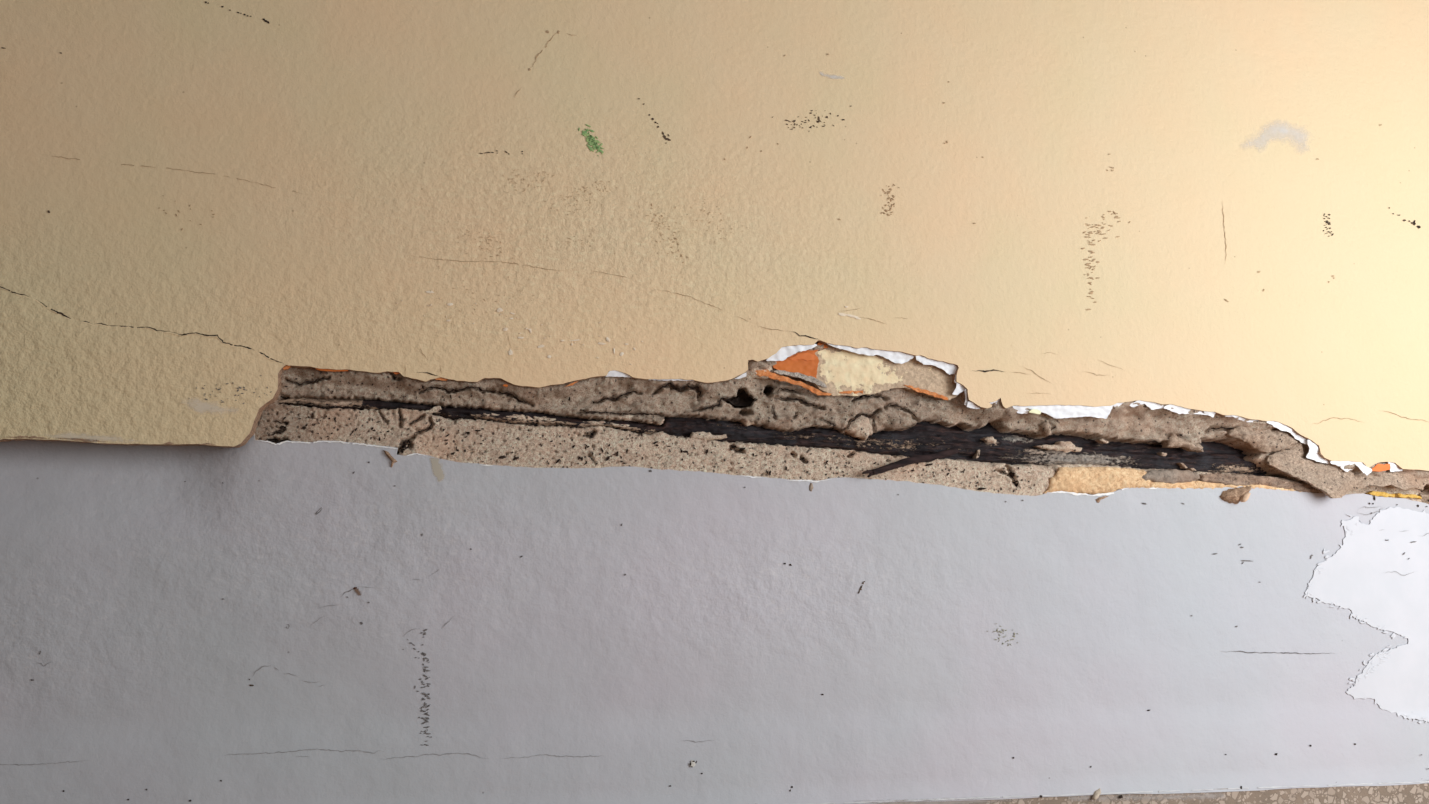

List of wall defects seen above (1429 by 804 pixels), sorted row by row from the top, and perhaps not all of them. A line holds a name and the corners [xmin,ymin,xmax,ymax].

crack [0,286,285,366]
spalling [191,322,1429,515]